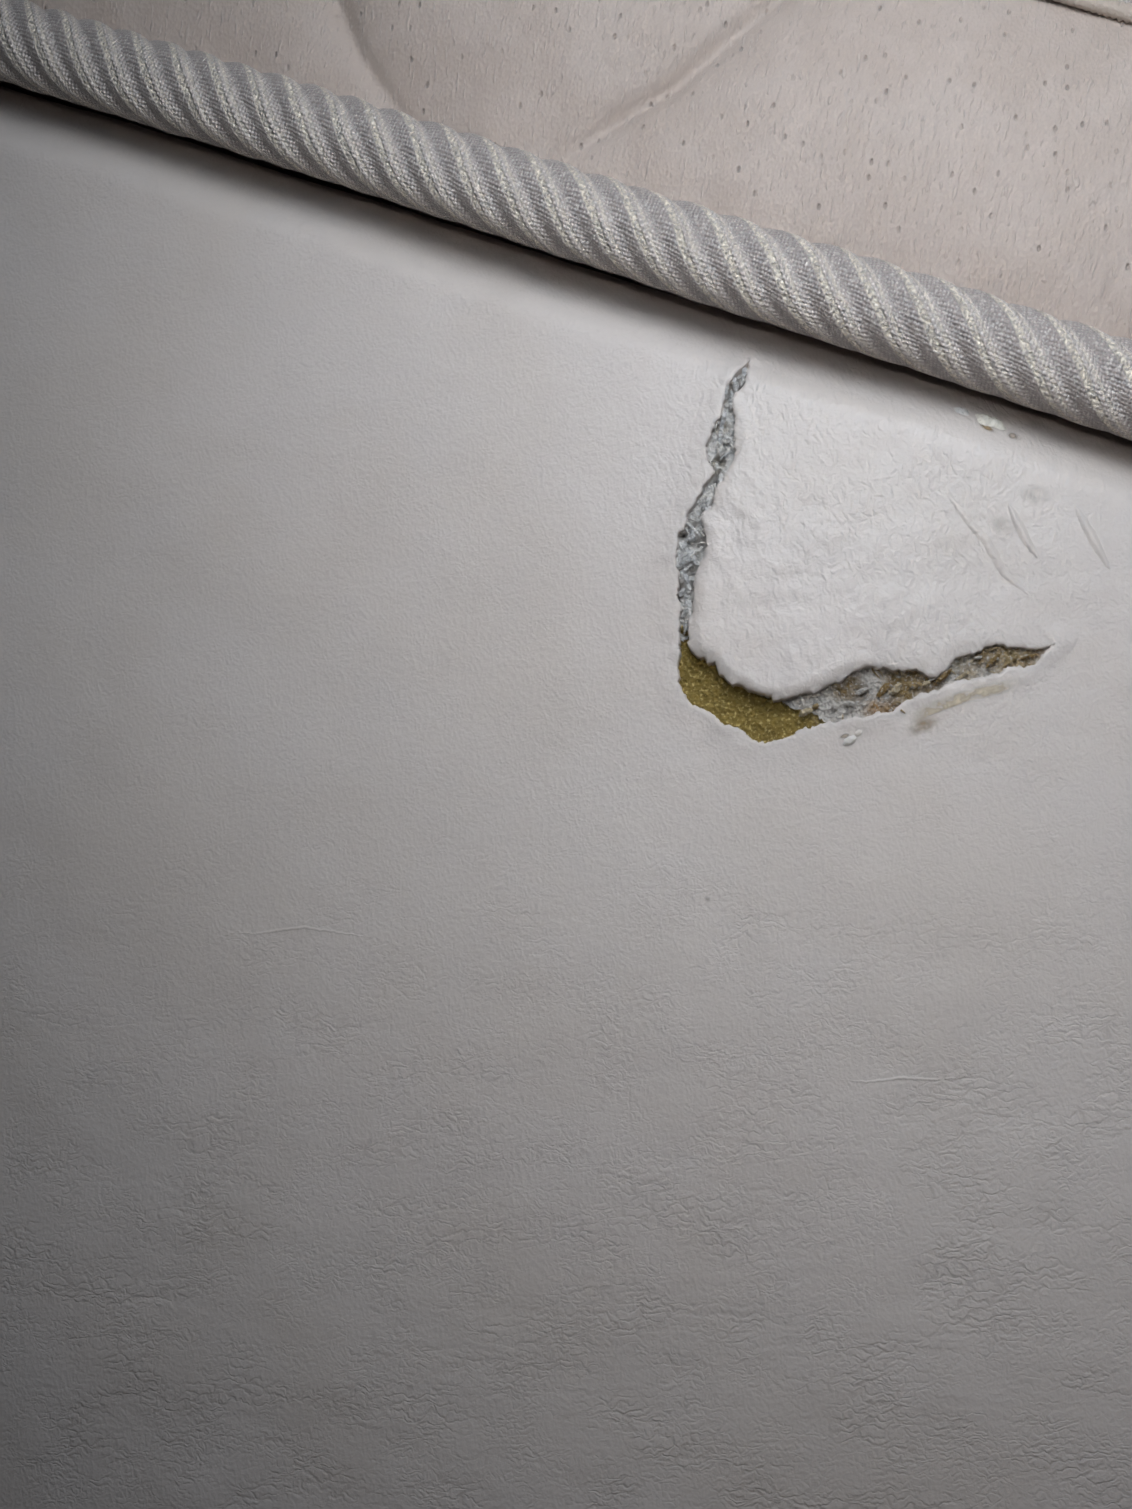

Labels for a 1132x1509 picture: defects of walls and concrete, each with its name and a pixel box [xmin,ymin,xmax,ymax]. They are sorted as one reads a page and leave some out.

peeling [954,407,1016,438]